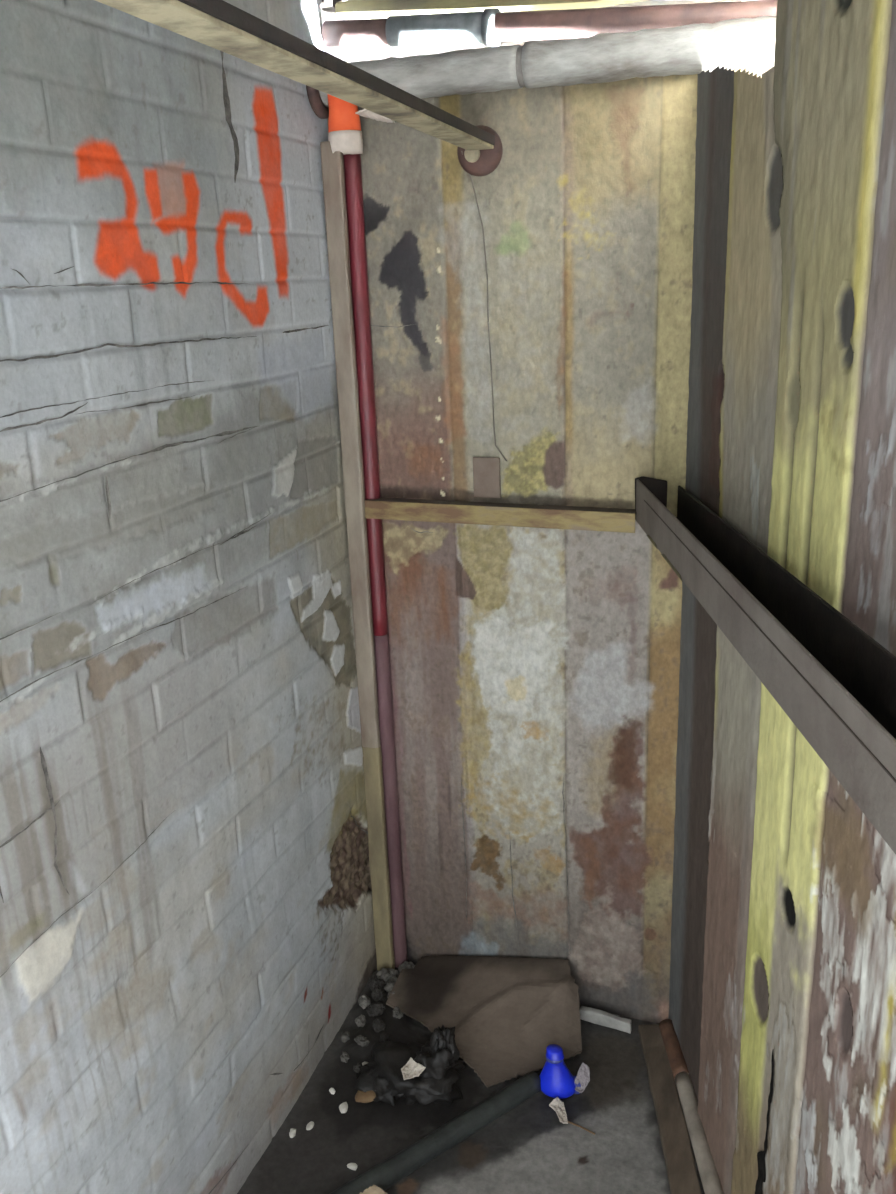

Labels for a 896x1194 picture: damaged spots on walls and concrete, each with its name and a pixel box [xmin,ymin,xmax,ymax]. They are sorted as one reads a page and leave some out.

crack [220,51,239,182]
crack [0,380,210,432]
crack [0,325,328,362]
peeling [0,568,363,768]
corrosion [384,555,468,667]
leakage [4,745,91,1010]
spalling [312,817,372,978]
corrosion [453,707,659,942]
leakage [79,960,179,1054]
peeling [762,816,896,1194]
leakage [8,1083,31,1126]
crack [755,1051,774,1194]